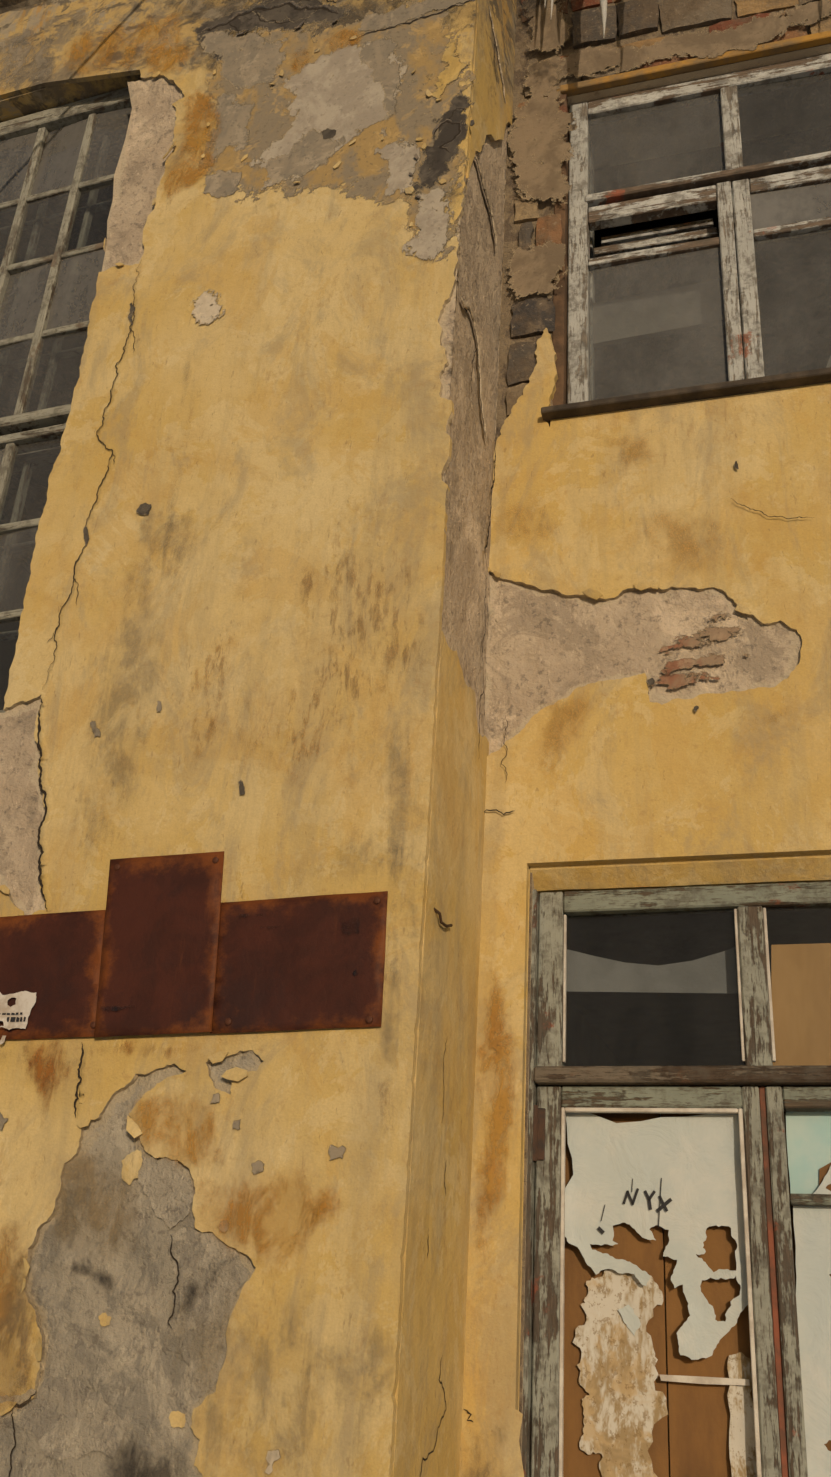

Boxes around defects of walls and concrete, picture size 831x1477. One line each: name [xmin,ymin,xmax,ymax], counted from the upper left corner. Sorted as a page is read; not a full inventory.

crack [202,0,506,104]
crack [432,108,497,250]
flaking render [191,0,802,755]
crack [37,260,144,911]
flaking render [0,699,45,915]
corrosion [29,1045,55,1093]
flaking render [208,1051,263,1104]
flaking render [0,1065,256,1477]